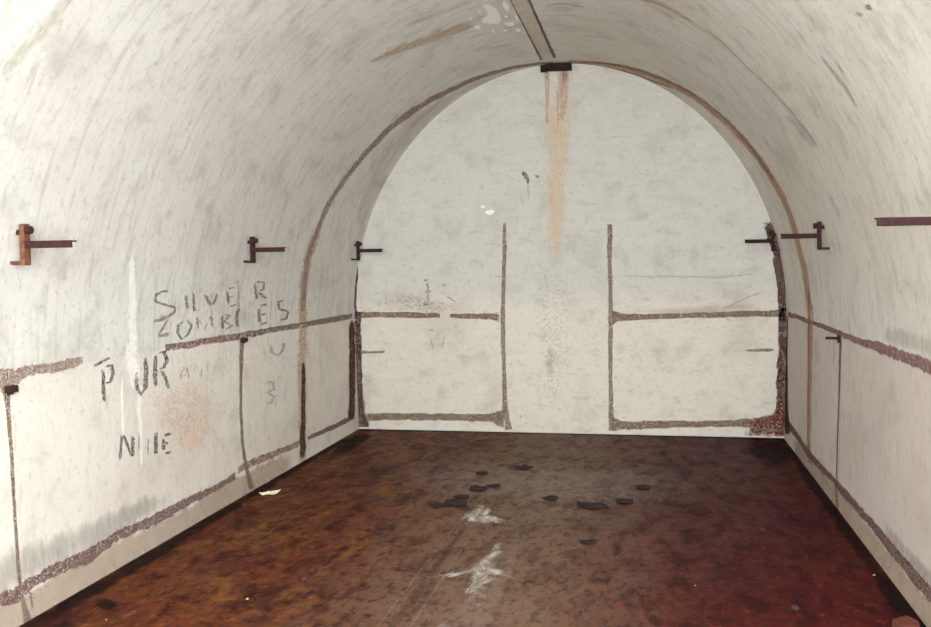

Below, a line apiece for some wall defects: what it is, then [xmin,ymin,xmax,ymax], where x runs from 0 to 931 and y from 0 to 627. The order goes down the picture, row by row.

spalling [469,0,520,32]
rust [297,0,815,462]